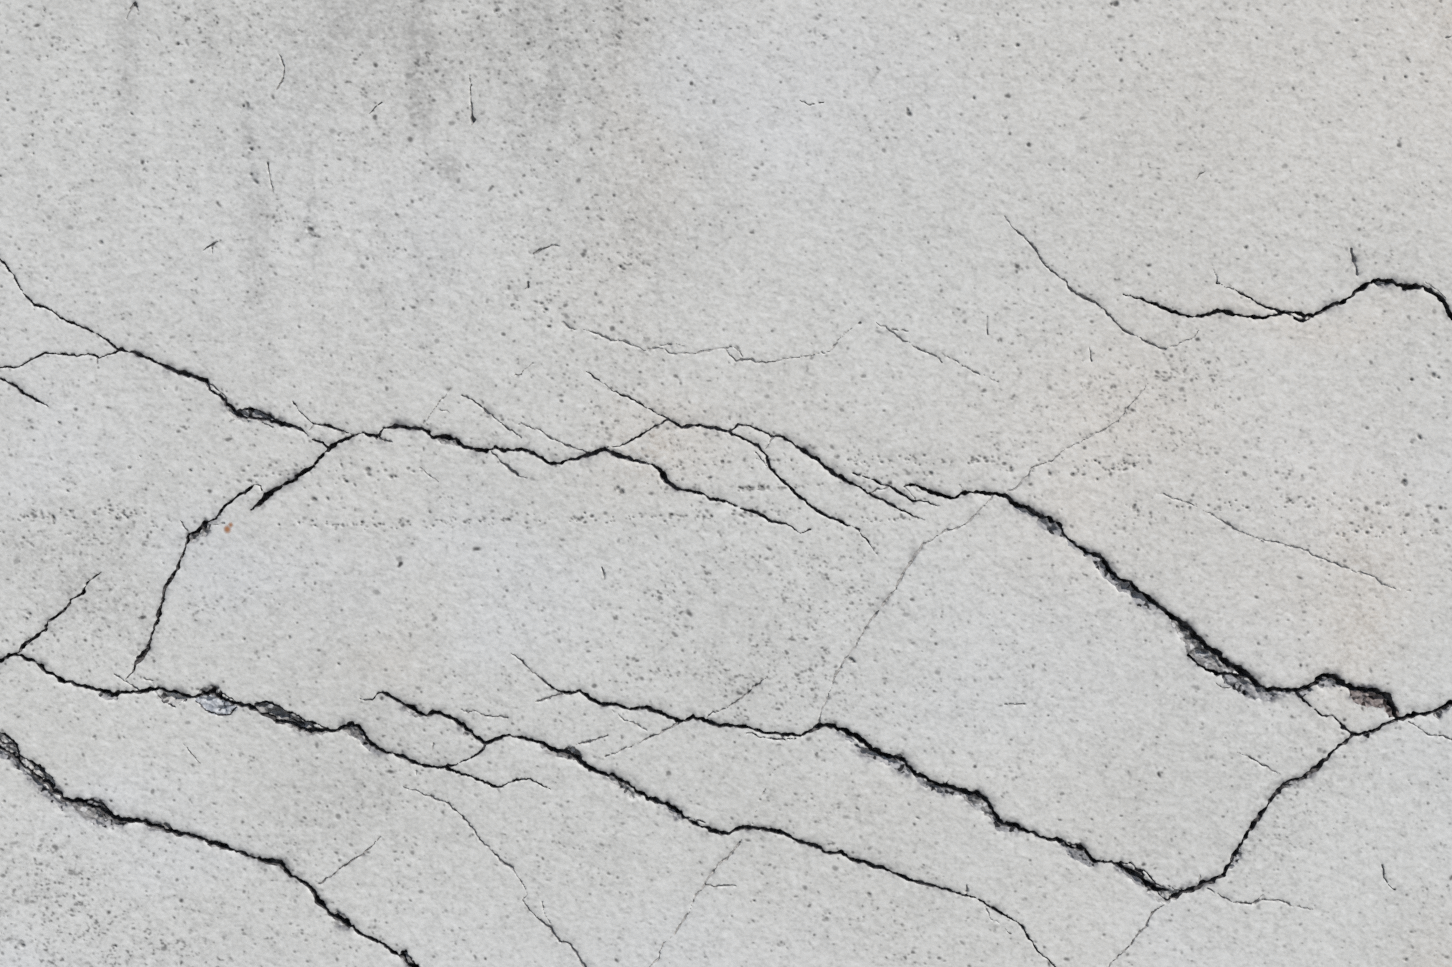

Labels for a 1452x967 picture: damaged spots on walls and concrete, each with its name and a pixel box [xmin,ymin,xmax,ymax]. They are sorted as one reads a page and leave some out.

crack [0,259,1452,967]
crack [1004,216,1452,351]